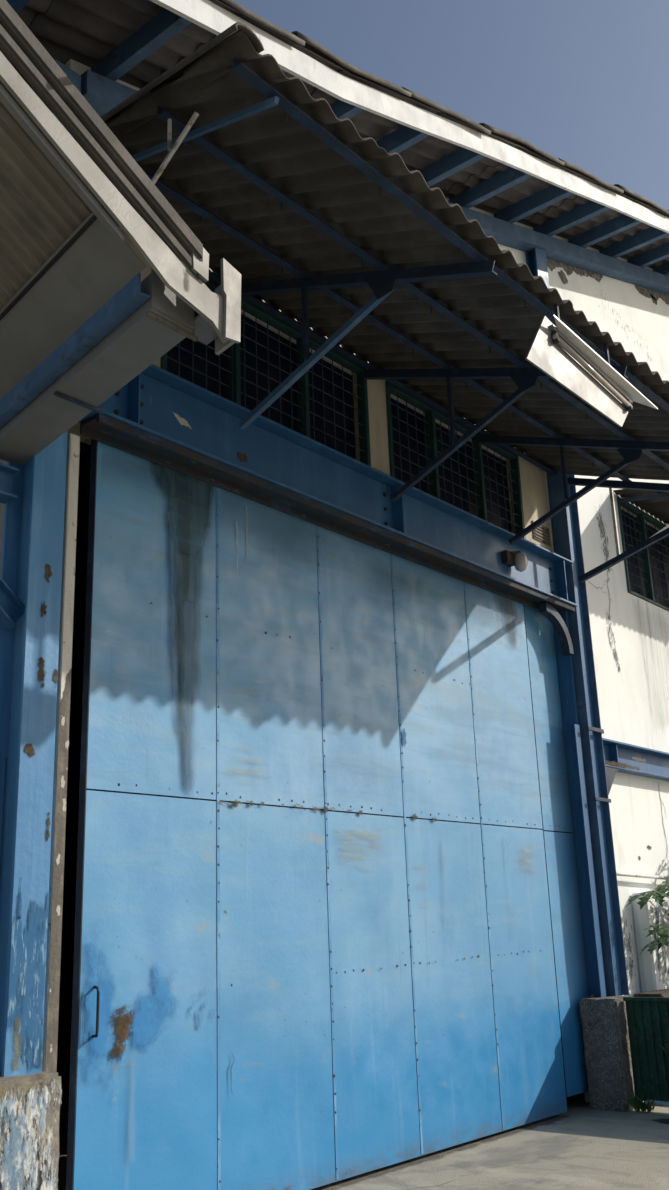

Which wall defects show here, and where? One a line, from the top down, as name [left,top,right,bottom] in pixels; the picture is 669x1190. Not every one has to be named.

rust [38,657,59,688]
damp [155,463,213,790]
peeling [0,669,71,1190]
rust [110,1005,134,1060]